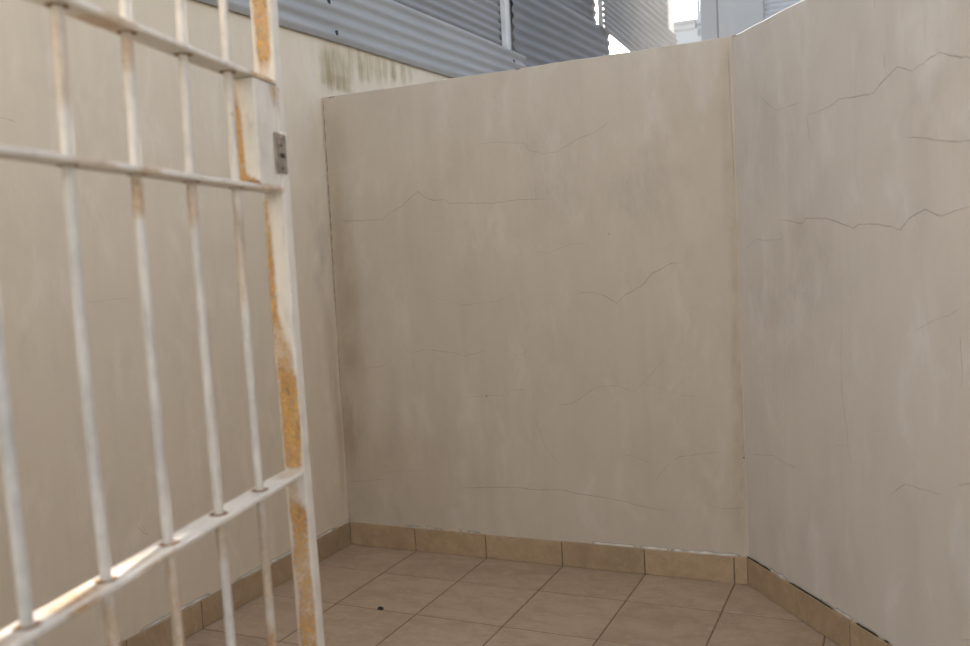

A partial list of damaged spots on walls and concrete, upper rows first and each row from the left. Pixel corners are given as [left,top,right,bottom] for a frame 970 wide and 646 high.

corrosion [252,0,275,94]
corrosion [265,206,301,467]
corrosion [290,500,316,646]